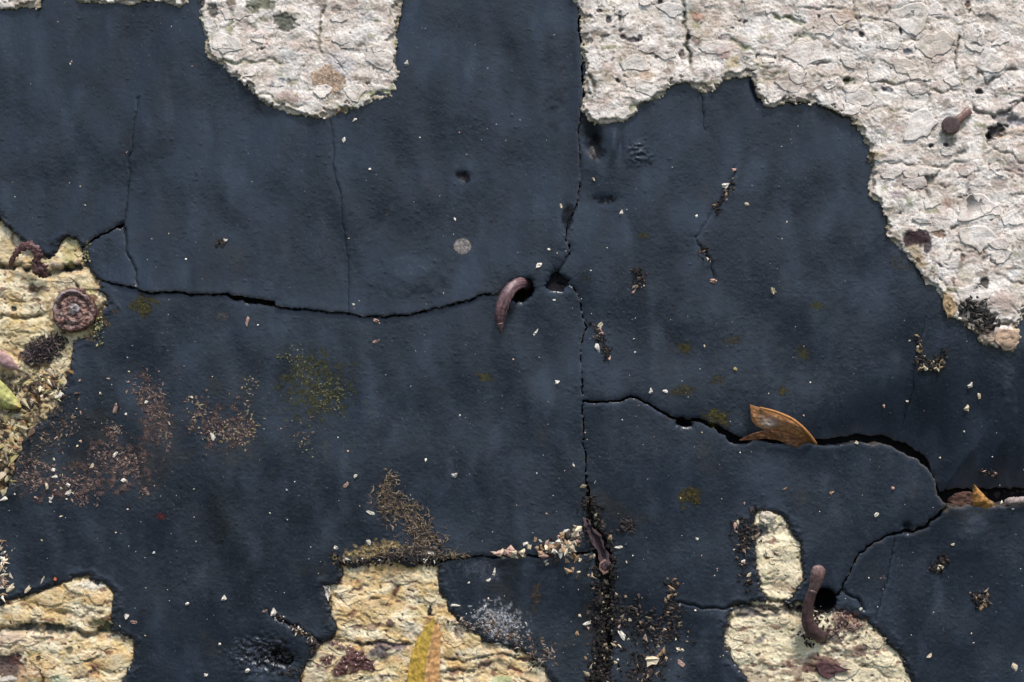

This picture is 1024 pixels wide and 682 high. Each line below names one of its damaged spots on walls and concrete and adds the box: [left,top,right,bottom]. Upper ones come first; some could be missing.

peeling [77,0,403,119]
crack [576,9,584,159]
rust [8,240,49,279]
crack [83,102,490,318]
peeling [573,0,1024,352]
peeling [0,220,108,487]
crack [440,185,786,588]
crack [815,323,1024,619]
peeling [0,575,135,682]
peeling [299,559,552,682]
crack [678,602,752,610]
peeling [724,510,912,682]